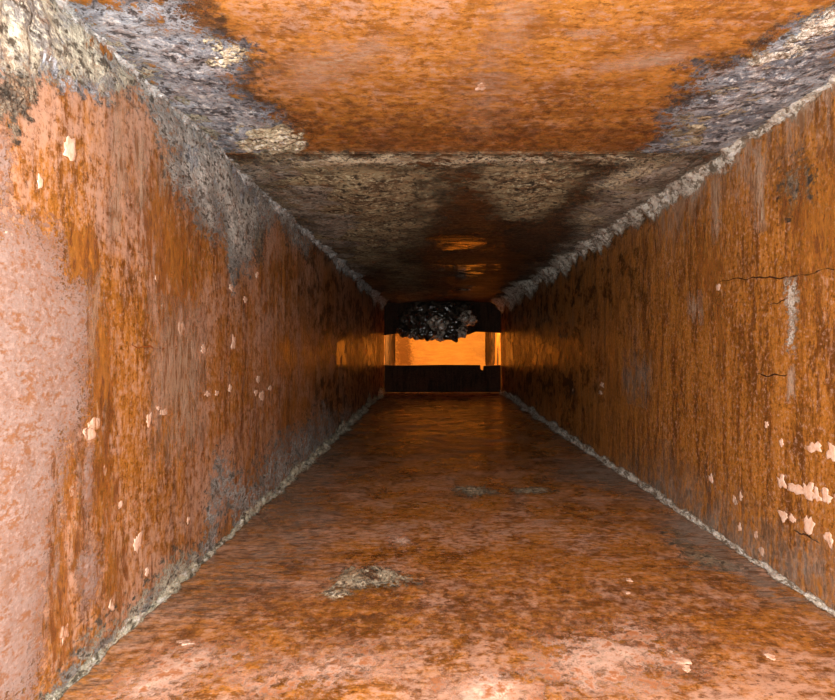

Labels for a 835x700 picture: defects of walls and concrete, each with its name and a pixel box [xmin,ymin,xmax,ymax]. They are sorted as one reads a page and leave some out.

rust [160,0,240,44]
rust [137,153,203,447]
crack [720,268,835,305]
leakage [782,276,800,401]
rust [42,223,130,674]
leakage [497,323,835,618]
peeling [776,474,835,504]
peeling [806,441,835,462]
peeling [777,510,815,535]
peeling [823,532,833,549]
spalling [320,565,424,600]
rust [224,585,732,652]